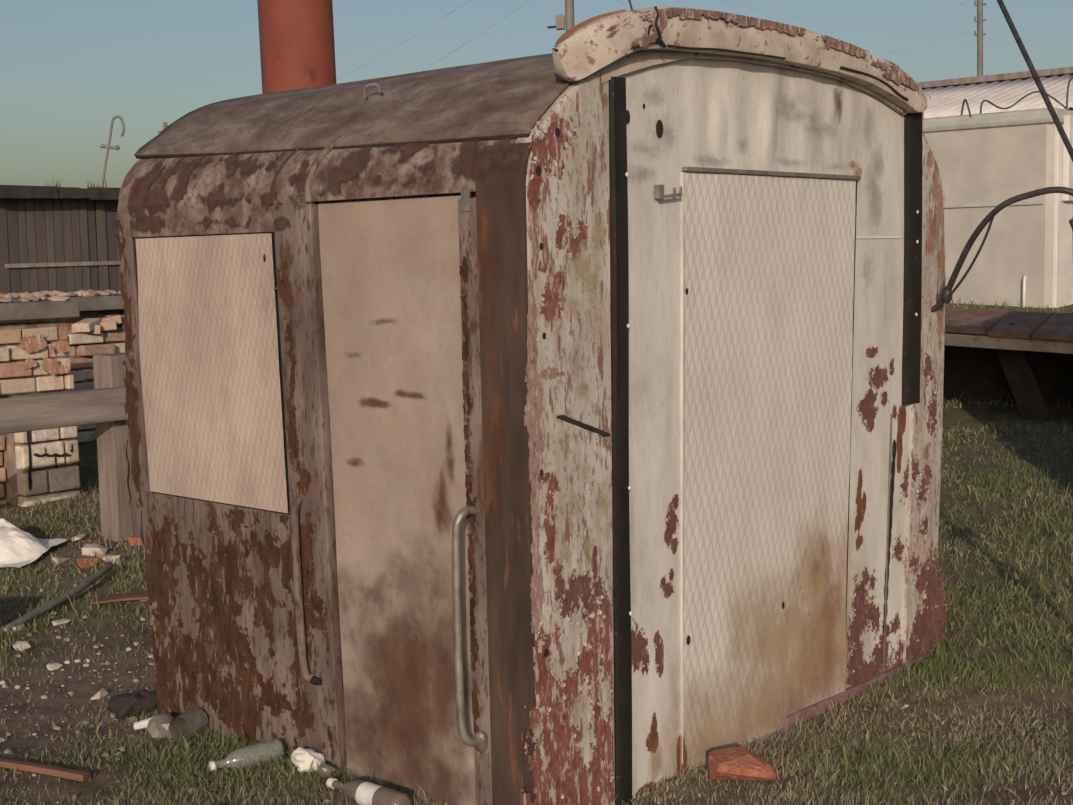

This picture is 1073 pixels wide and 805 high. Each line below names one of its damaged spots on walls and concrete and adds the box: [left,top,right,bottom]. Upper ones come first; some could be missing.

peeling [606,8,931,100]
corrosion [451,137,521,182]
peeling [526,114,577,215]
peeling [555,213,588,263]
peeling [856,347,897,432]
corrosion [114,142,469,805]
peeling [519,260,614,805]
peeling [660,569,674,599]
peeling [664,494,680,555]
peeling [845,455,948,688]
peeling [631,619,664,677]
corrosion [635,551,852,797]